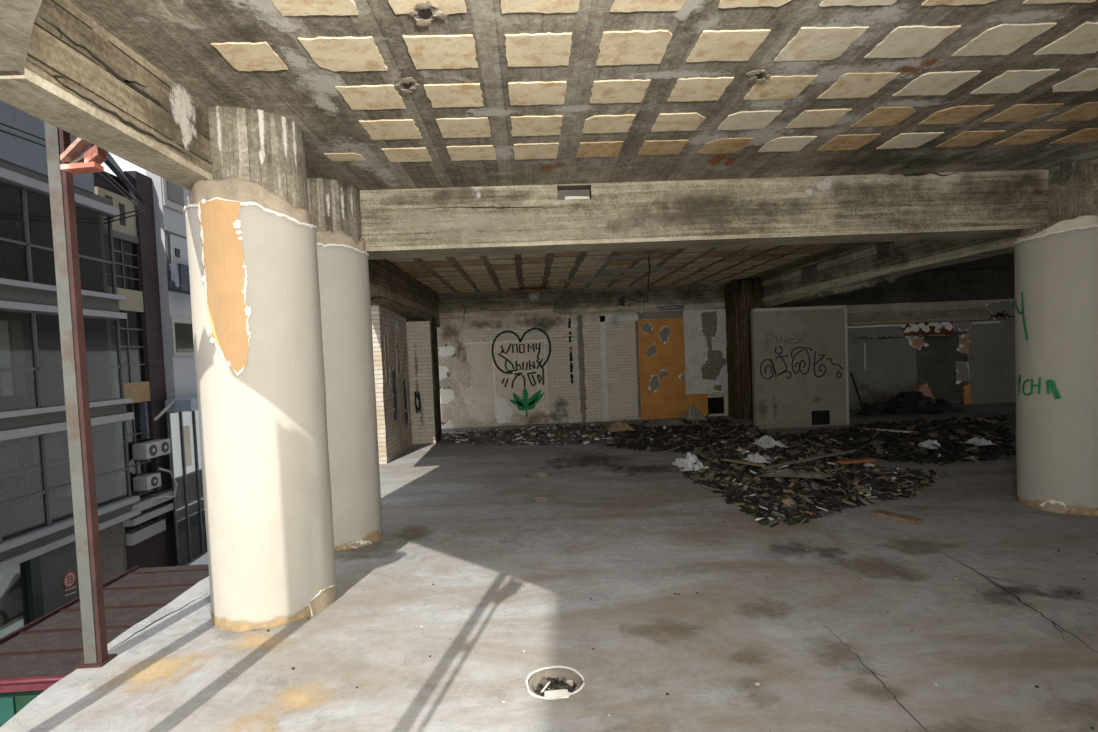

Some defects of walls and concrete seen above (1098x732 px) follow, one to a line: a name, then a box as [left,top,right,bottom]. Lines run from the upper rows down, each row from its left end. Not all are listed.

water stain [434,187,484,201]
water stain [793,176,874,208]
flaking render [184,197,369,376]
peeling [635,322,672,357]
peeling [648,369,685,392]
flaking render [700,310,727,392]
peeling [902,321,972,405]
crack [930,546,1097,652]
crack [816,617,928,732]